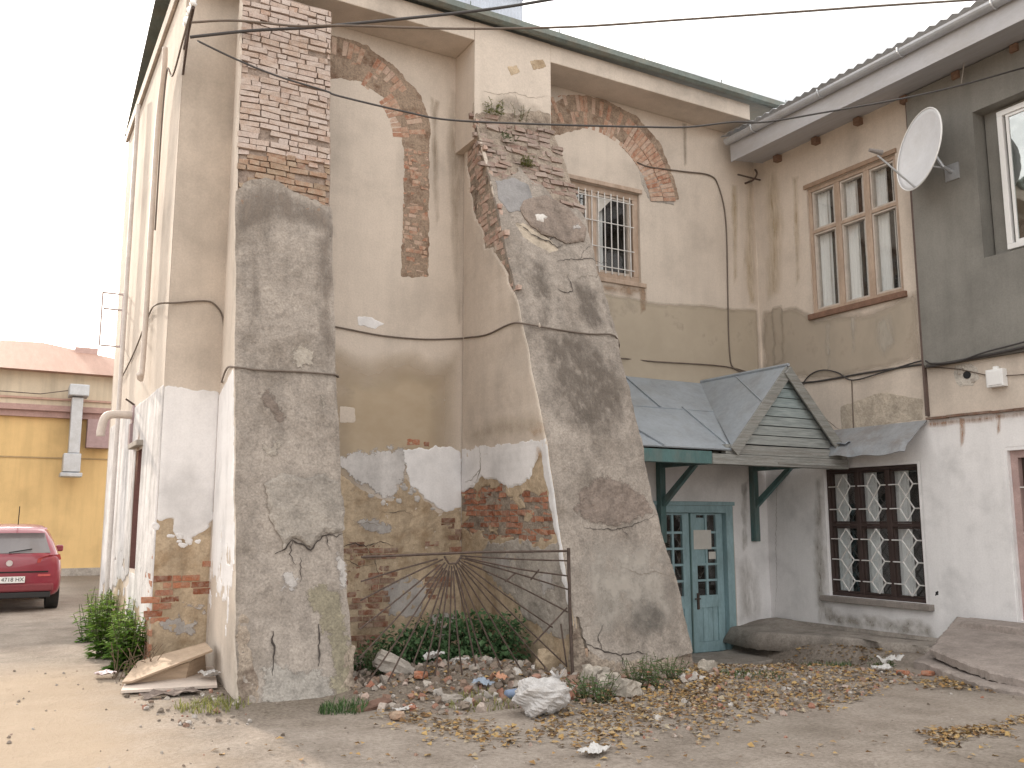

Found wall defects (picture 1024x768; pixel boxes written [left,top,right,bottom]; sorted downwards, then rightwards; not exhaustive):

flaking render [237,152,330,211]
spalling [467,110,558,291]
peeling [100,512,213,660]
crack [275,511,411,582]
peeling [235,450,693,703]
crack [269,631,277,676]
crack [315,624,323,666]
crack [587,624,648,665]